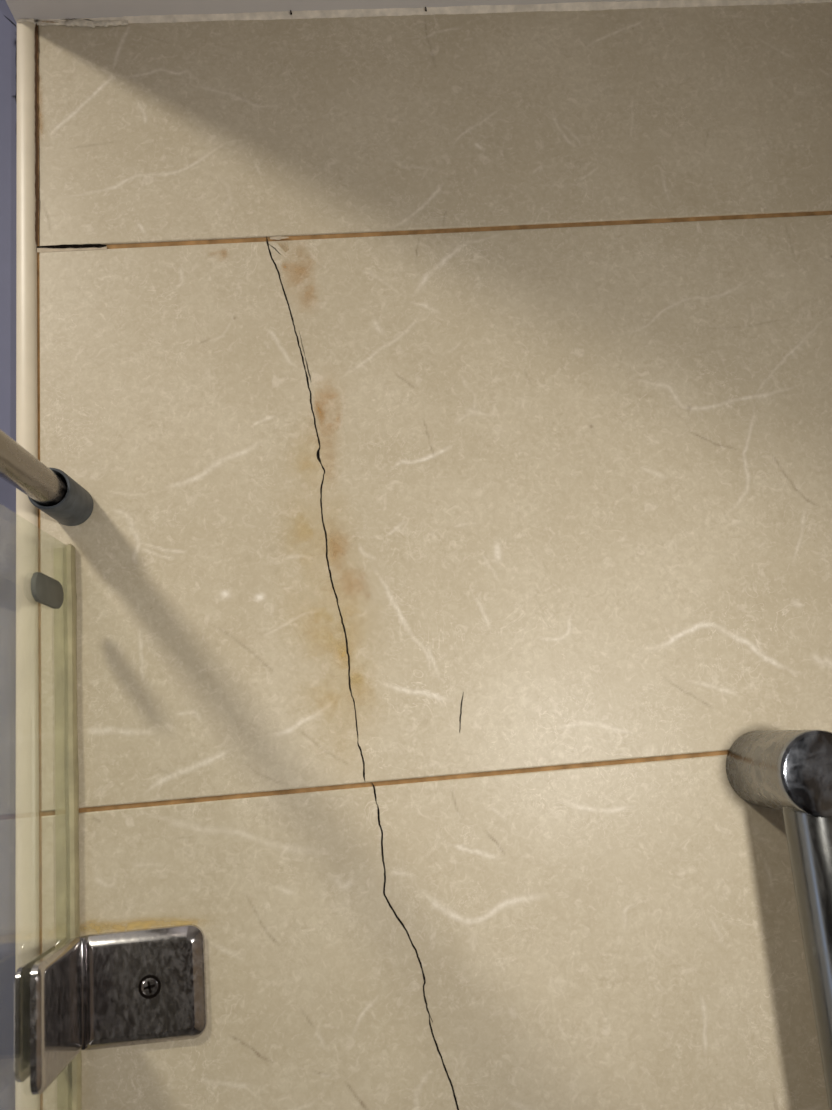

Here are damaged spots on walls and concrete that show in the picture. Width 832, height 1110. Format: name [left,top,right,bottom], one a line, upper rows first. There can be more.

crack [266,237,459,1110]